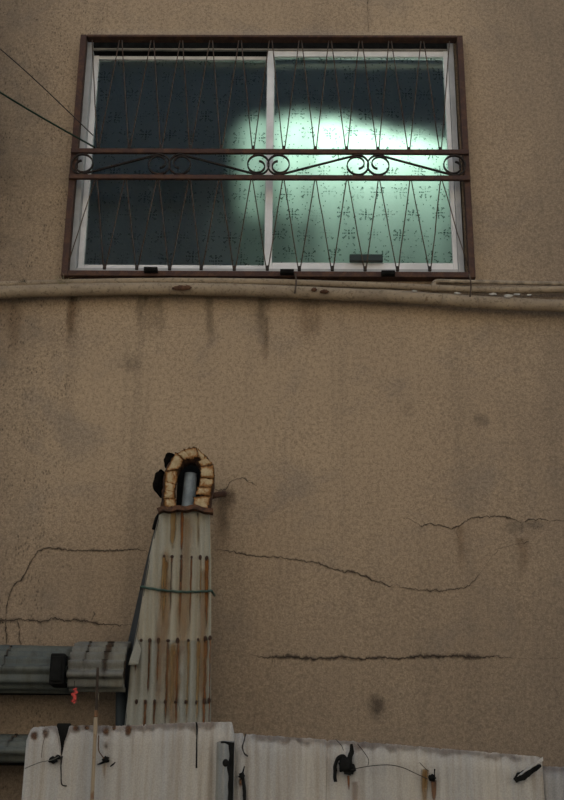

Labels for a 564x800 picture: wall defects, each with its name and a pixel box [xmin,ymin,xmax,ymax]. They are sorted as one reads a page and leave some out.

crack [0,540,148,643]
crack [217,541,529,592]
crack [231,650,557,663]